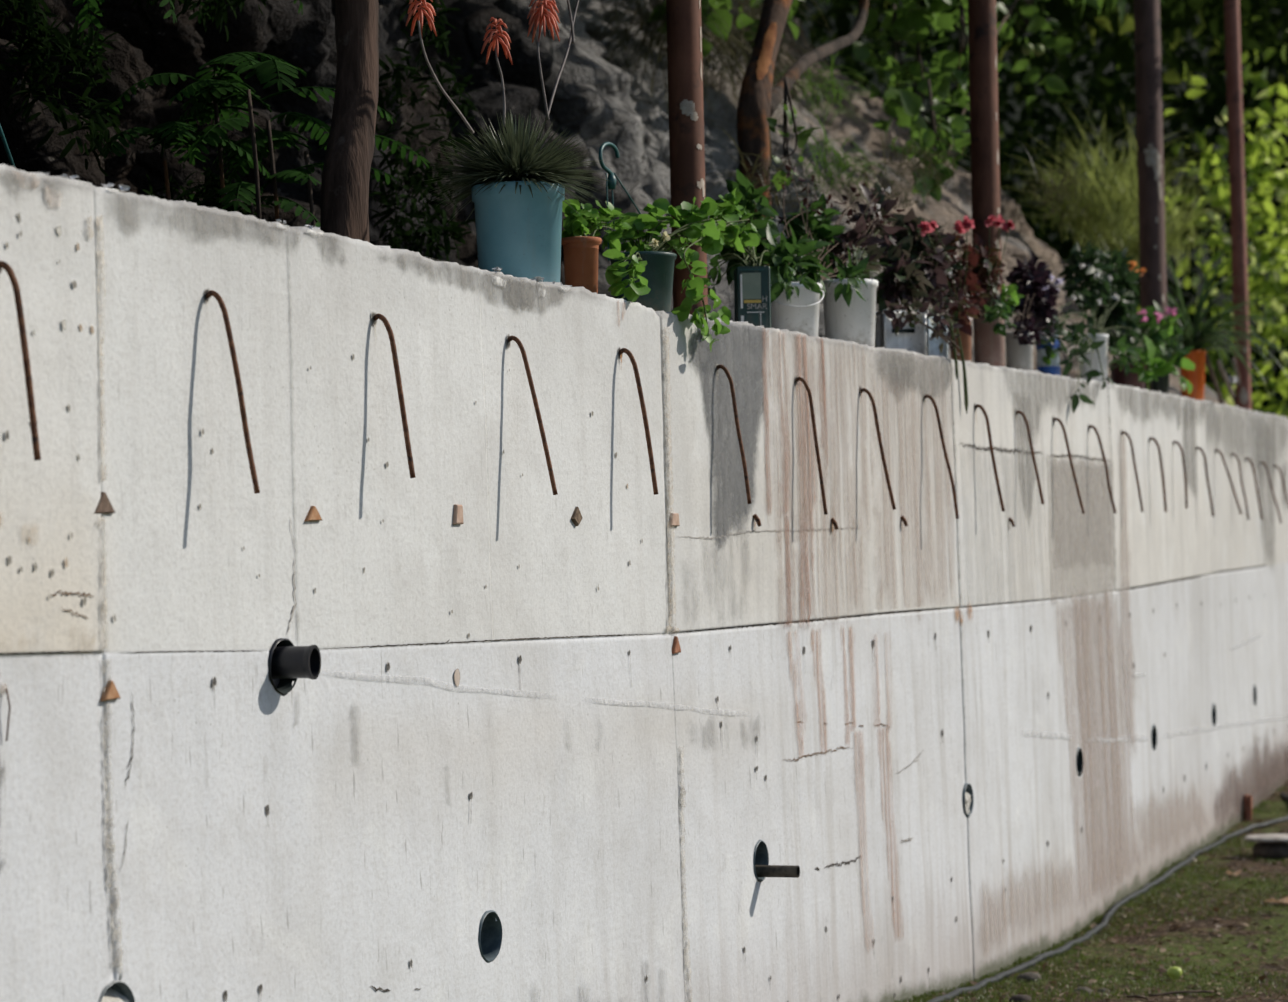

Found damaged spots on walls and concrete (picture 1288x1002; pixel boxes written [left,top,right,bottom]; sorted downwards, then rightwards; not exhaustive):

damp [692,321,766,546]
rust [763,332,839,708]
crack [50,590,94,619]
crack [0,648,255,656]
rust [1059,516,1136,897]
crack [784,721,888,762]
crack [815,856,862,870]